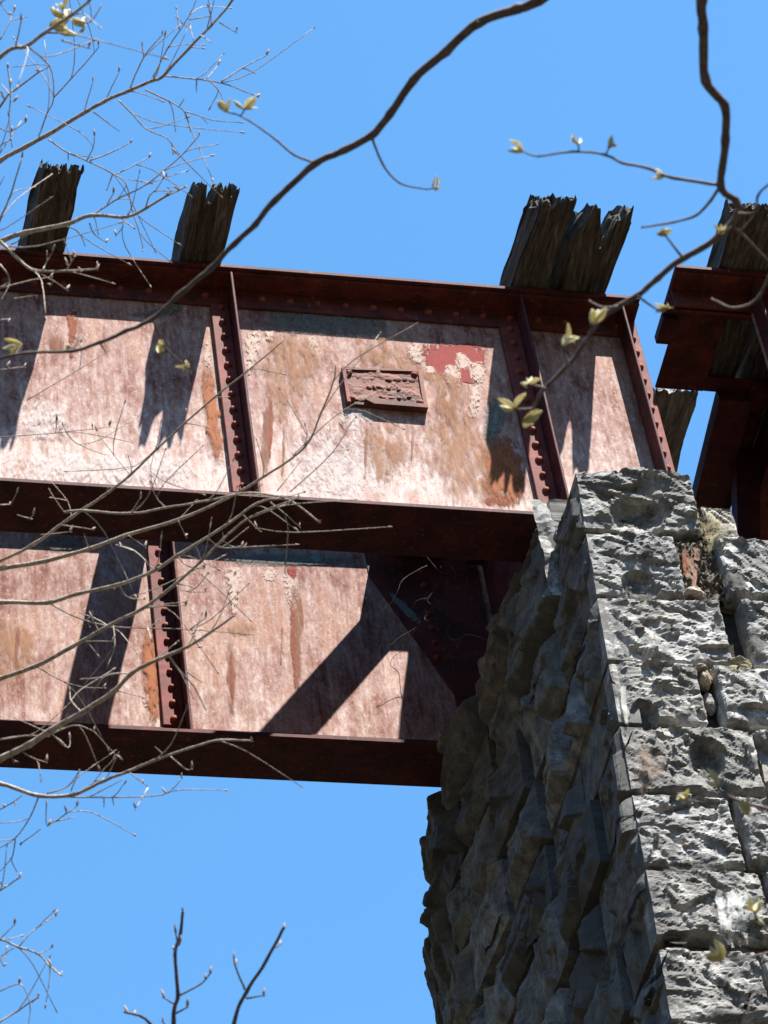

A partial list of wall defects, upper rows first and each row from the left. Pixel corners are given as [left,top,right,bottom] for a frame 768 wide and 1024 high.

rust [202,341,223,462]
rust [261,335,327,473]
rust [360,336,526,506]
peeling [407,343,487,418]
rust [280,576,304,687]